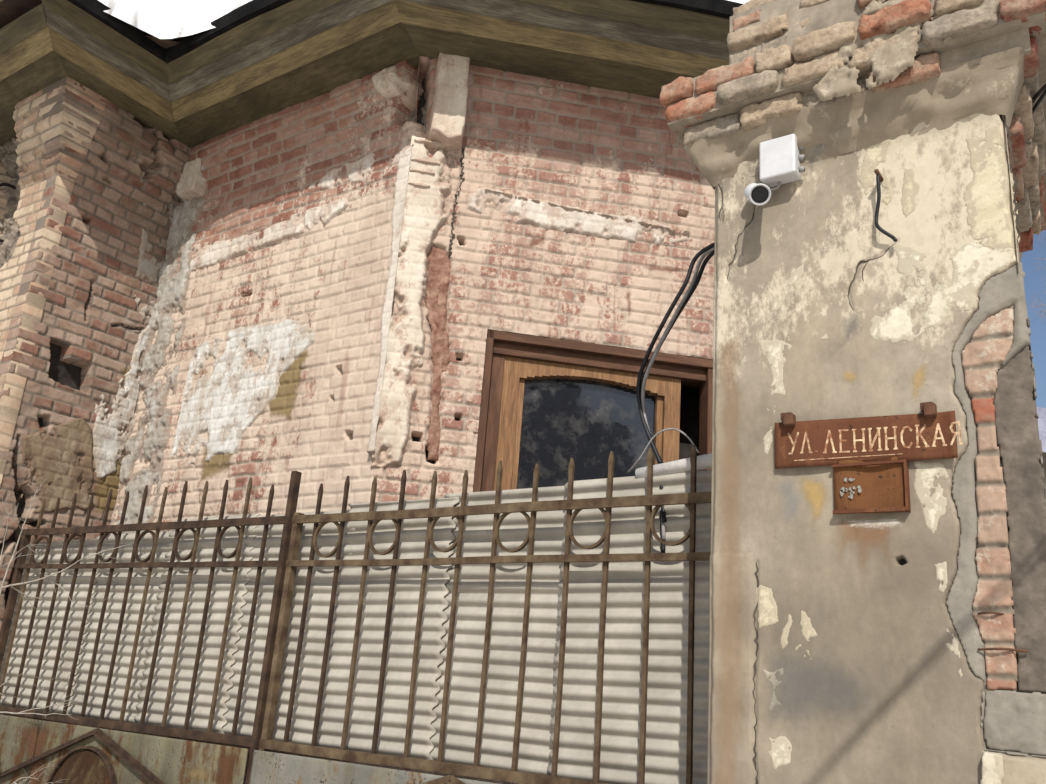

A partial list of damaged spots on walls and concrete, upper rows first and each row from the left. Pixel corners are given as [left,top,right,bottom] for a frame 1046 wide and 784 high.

peeling [135,228,165,285]
crack [448,146,465,260]
crack [718,183,755,280]
crack [848,244,894,310]
peeling [14,294,155,513]
peeling [172,319,316,471]
peeling [763,427,772,454]
peeling [759,340,792,413]
spalling [870,125,1046,759]
peeling [756,585,817,660]
peeling [762,668,783,711]
peeling [768,736,792,769]